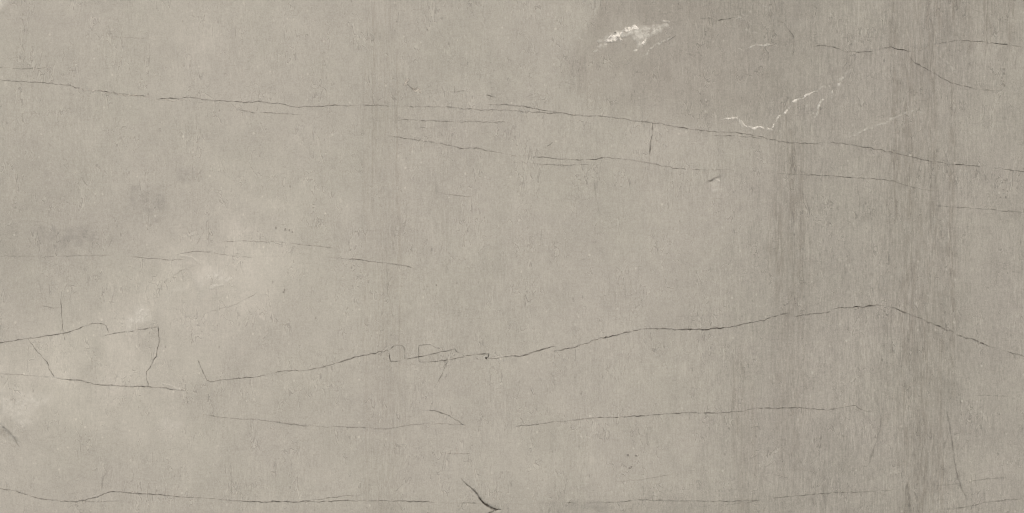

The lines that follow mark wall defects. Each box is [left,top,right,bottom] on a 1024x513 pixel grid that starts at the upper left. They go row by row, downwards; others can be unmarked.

leakage [561,0,1024,513]